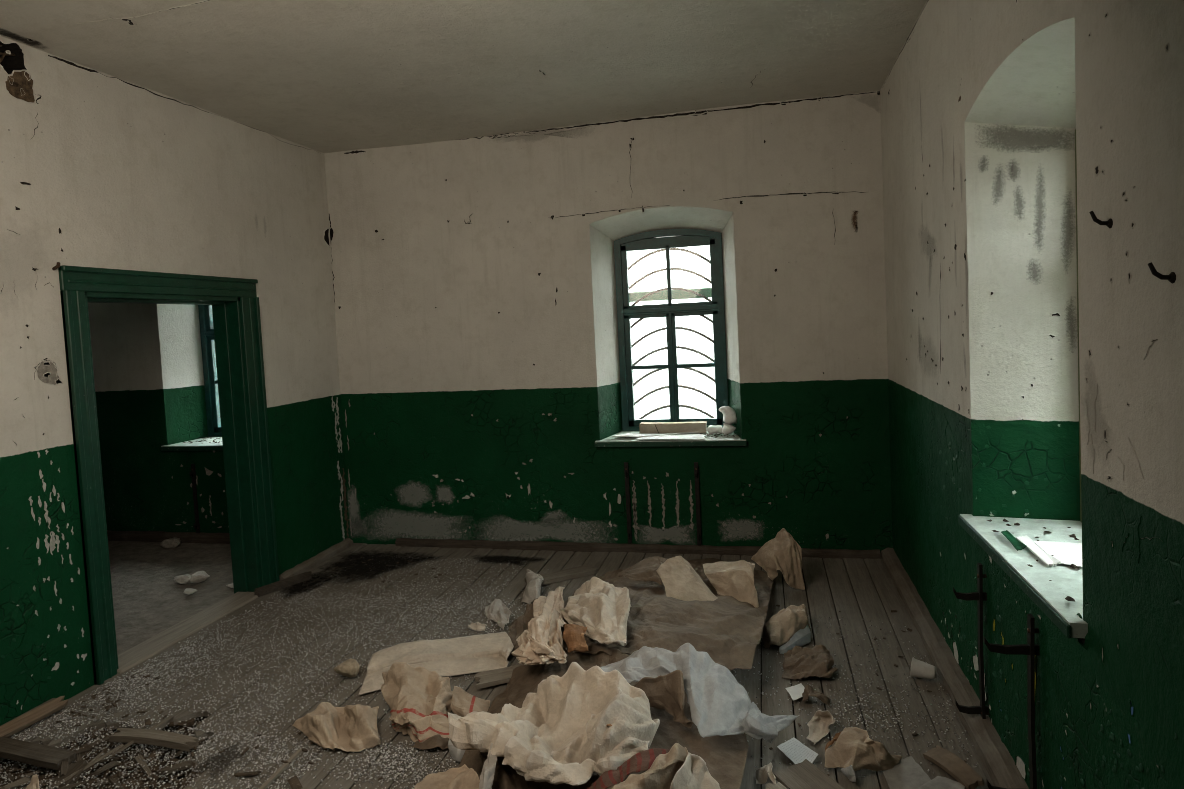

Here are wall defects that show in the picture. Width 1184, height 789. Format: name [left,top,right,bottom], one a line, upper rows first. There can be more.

flaking render [0,41,42,140]
leakage [980,127,1074,197]
leakage [1035,178,1044,246]
leakage [1063,202,1073,266]
flaking render [33,357,63,400]
leakage [1050,304,1074,347]
crack [1144,338,1158,360]
crack [1085,384,1144,480]
peeling [28,450,80,582]
peeling [331,396,475,540]
peeling [486,458,695,543]
peeling [42,624,88,687]